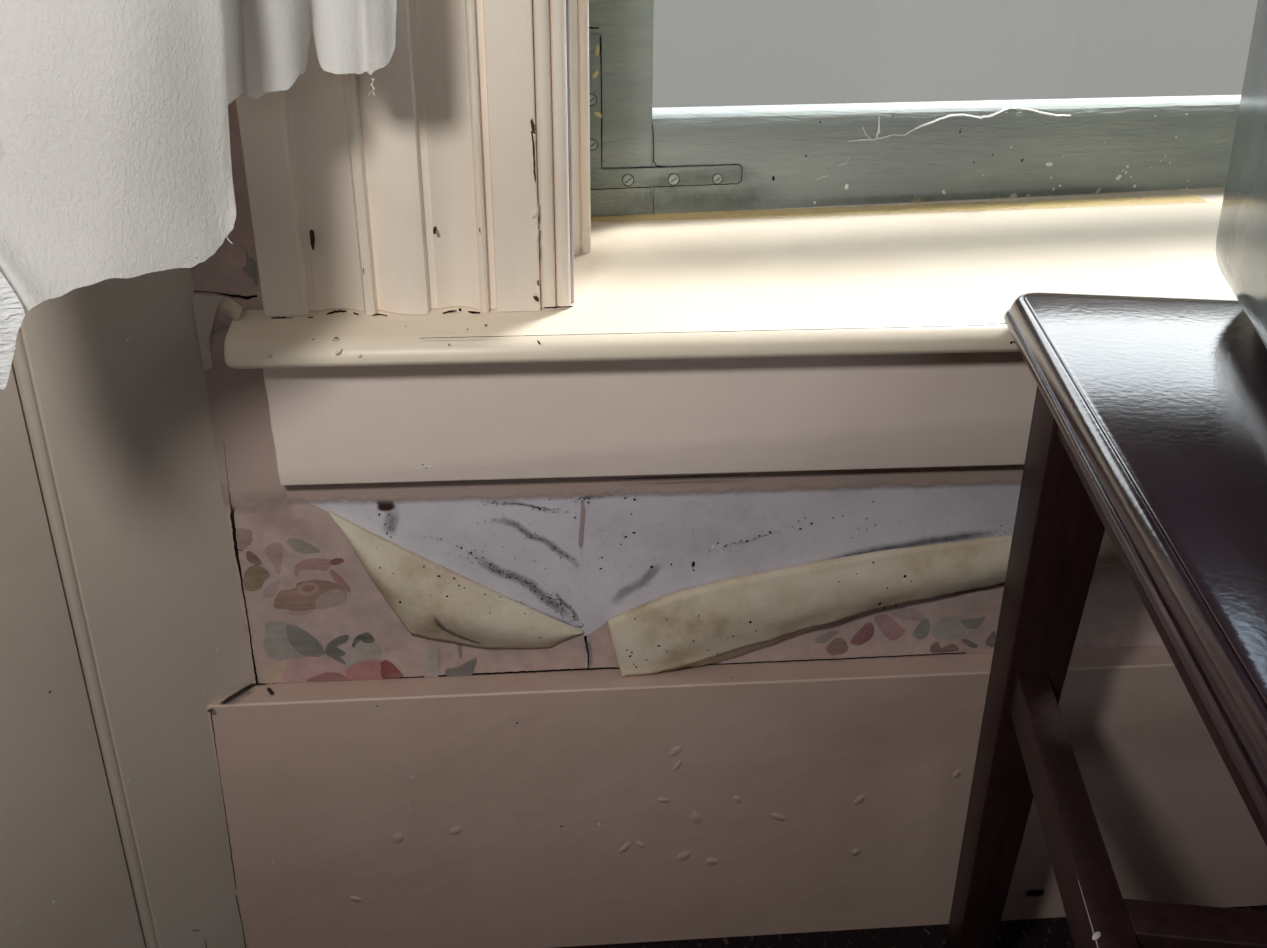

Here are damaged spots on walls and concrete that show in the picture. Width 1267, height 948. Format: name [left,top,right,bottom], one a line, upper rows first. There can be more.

leakage [457,536,584,628]
leakage [477,495,636,578]
flaking render [308,483,1021,640]